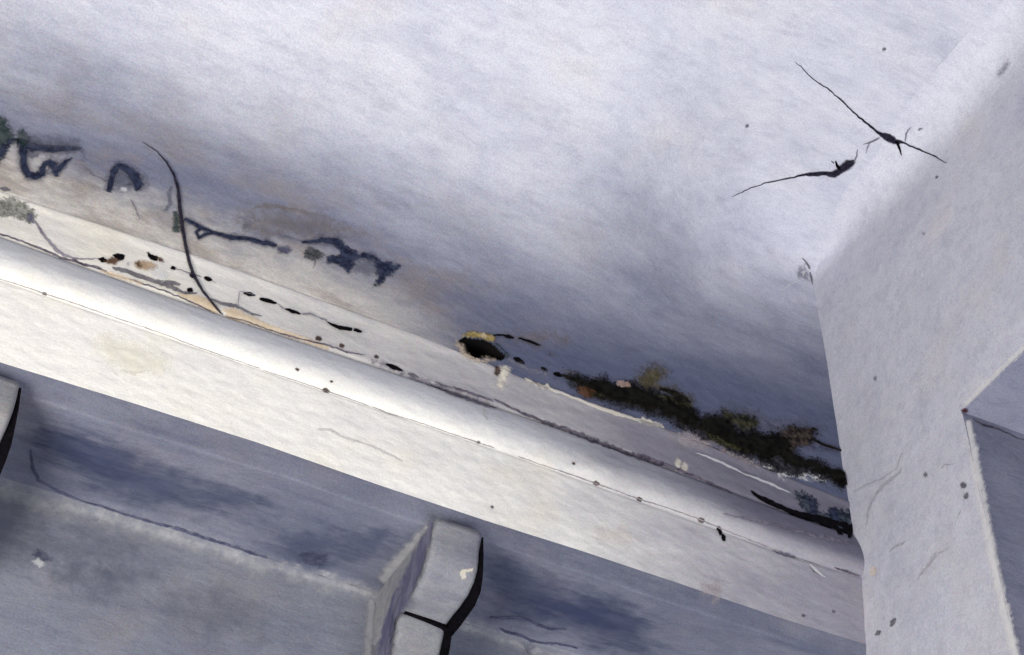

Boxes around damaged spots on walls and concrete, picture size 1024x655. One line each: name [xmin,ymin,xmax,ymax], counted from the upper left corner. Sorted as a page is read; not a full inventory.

crack [733,62,946,197]
crack [0,142,367,355]
crack [0,279,902,539]
spalling [456,331,541,387]
crack [518,456,818,565]
water stain [561,367,851,533]
crack [404,537,484,655]